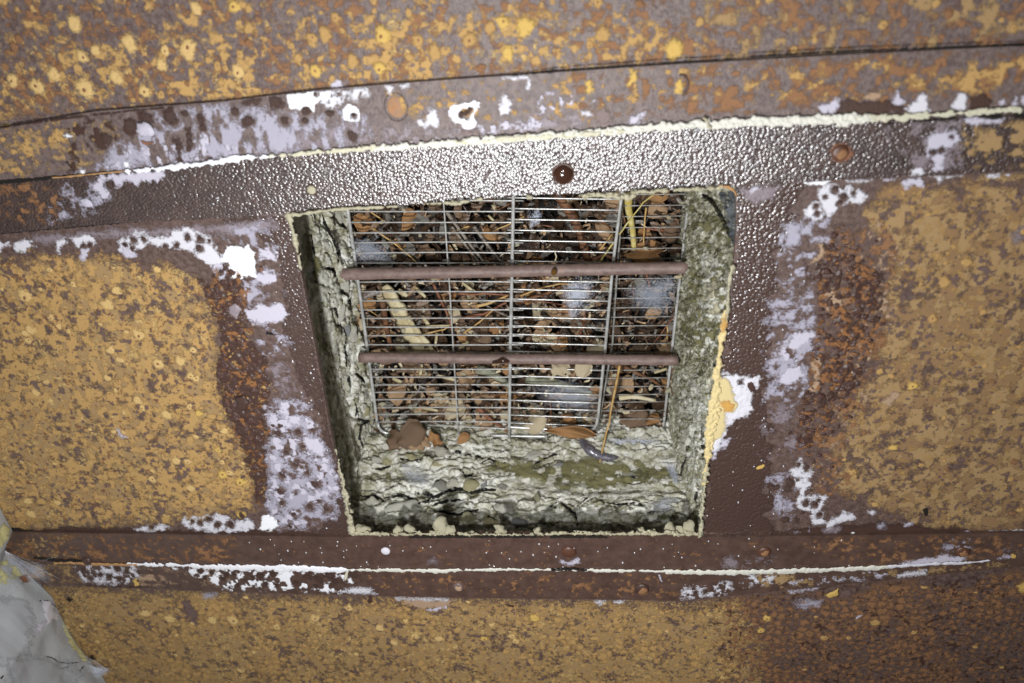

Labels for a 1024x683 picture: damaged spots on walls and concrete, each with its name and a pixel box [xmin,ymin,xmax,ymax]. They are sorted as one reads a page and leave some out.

corrosion [0,0,1024,223]
damp [77,565,139,586]
damp [172,567,377,600]
damp [0,76,596,533]
spalling [363,480,439,519]
corrosion [0,216,1024,683]
spalling [444,252,730,518]
damp [681,581,733,599]
damp [723,556,776,587]
corrosion [703,113,1024,576]
damp [788,540,971,609]
damp [757,90,1005,533]